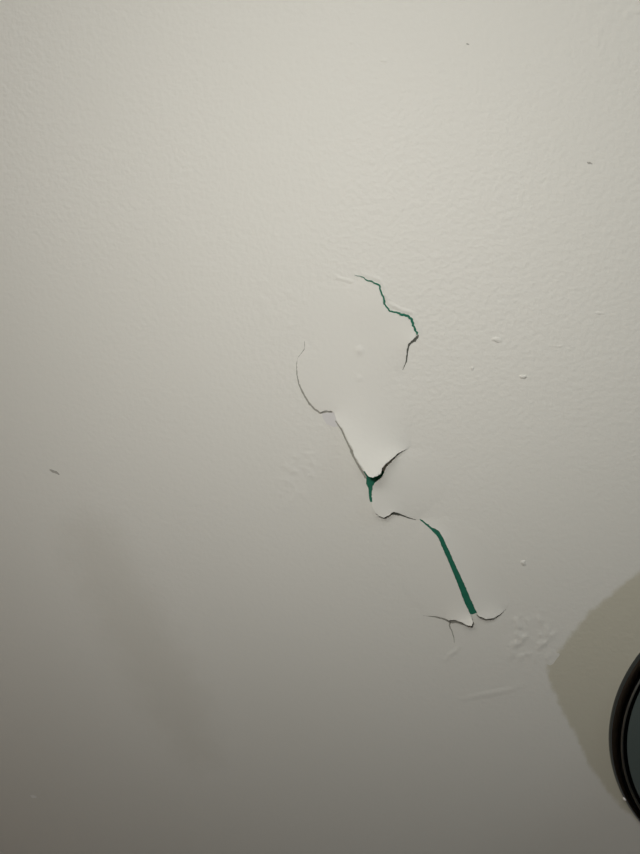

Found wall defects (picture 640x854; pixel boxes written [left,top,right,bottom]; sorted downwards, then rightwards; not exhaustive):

crack [355,270,424,368]
peeling [296,277,511,638]
water stain [537,559,640,836]